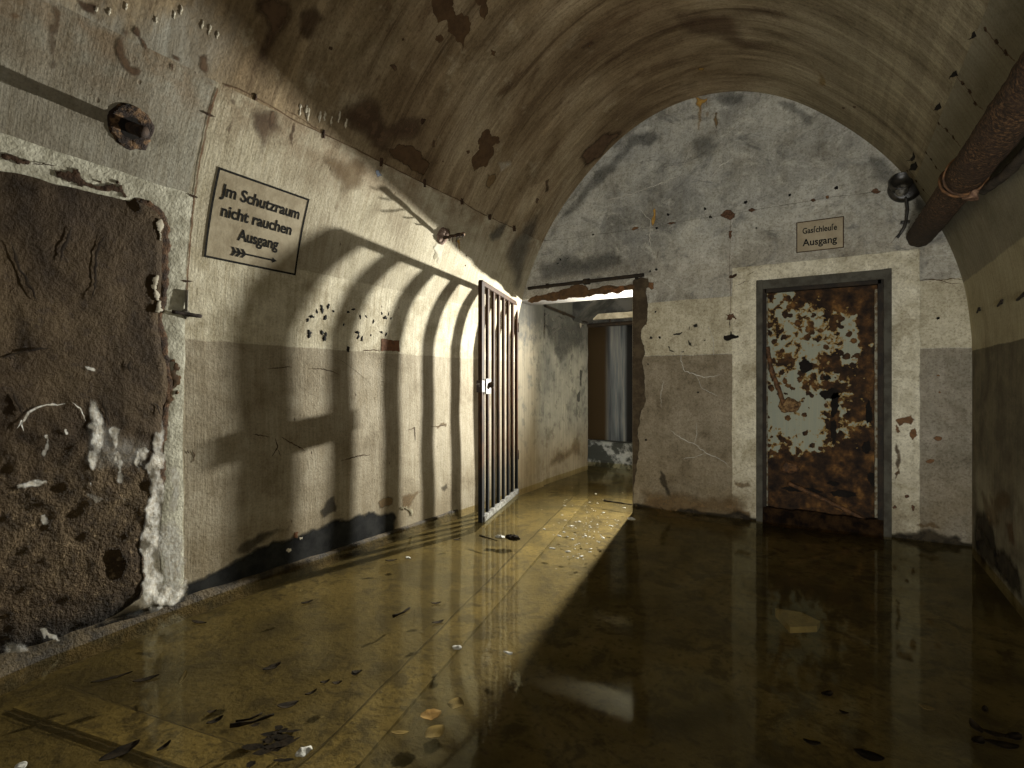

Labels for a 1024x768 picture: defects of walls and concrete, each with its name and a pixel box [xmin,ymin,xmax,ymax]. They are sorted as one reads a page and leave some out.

peeling [431,0,488,50]
peeling [389,140,444,175]
peeling [466,129,500,171]
spalling [0,154,181,654]
spalling [528,277,649,496]
leakage [17,401,418,628]
leakage [975,526,1021,597]